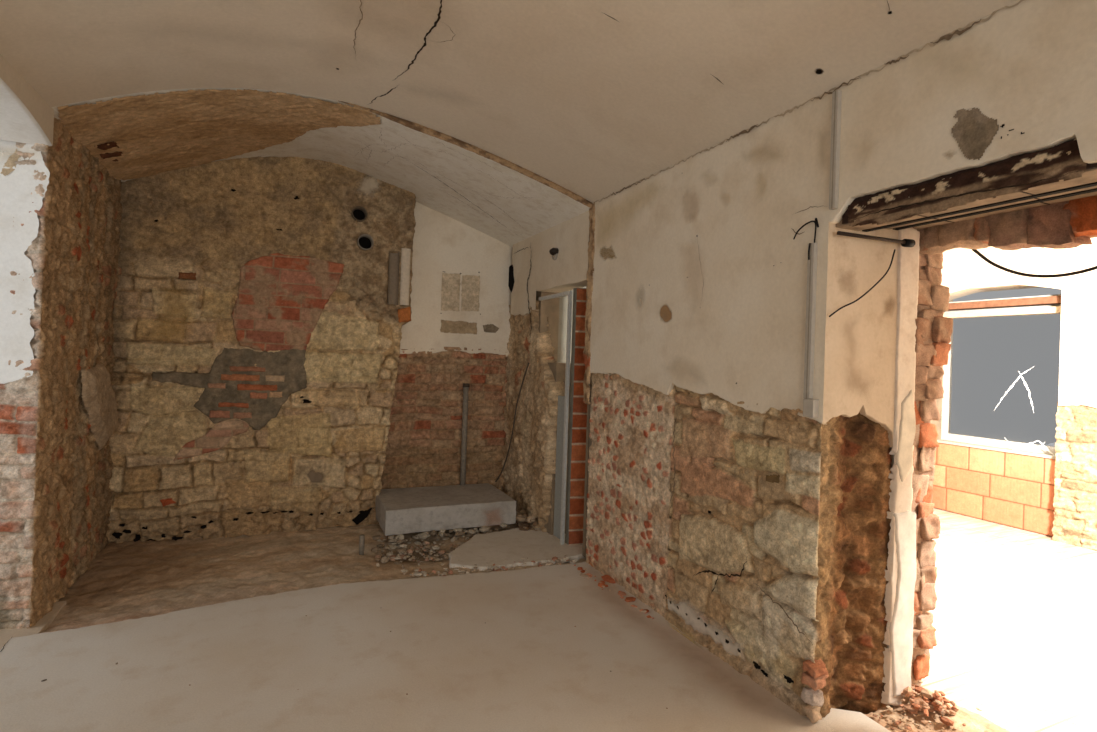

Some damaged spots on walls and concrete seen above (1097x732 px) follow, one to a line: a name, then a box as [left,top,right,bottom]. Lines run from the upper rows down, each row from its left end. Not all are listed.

crack [353,0,363,57]
crack [370,0,455,104]
crack [397,154,532,342]
flaking render [57,89,892,723]
spalling [911,195,1097,688]